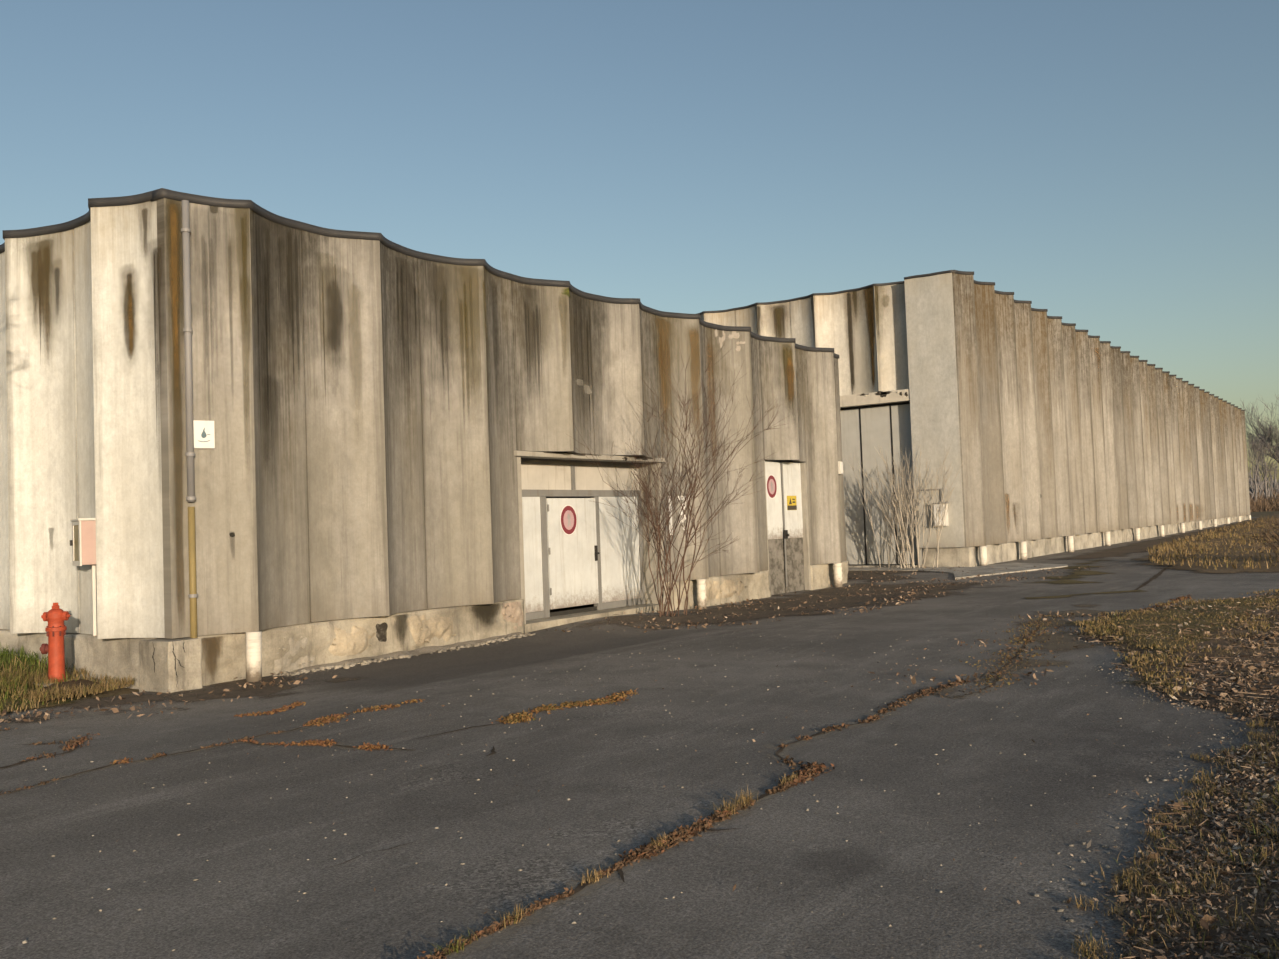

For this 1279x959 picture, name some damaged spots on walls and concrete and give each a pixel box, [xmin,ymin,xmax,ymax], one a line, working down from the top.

damp [32,248,50,318]
damp [328,283,342,348]
rust [864,286,878,384]
crack [152,641,185,688]